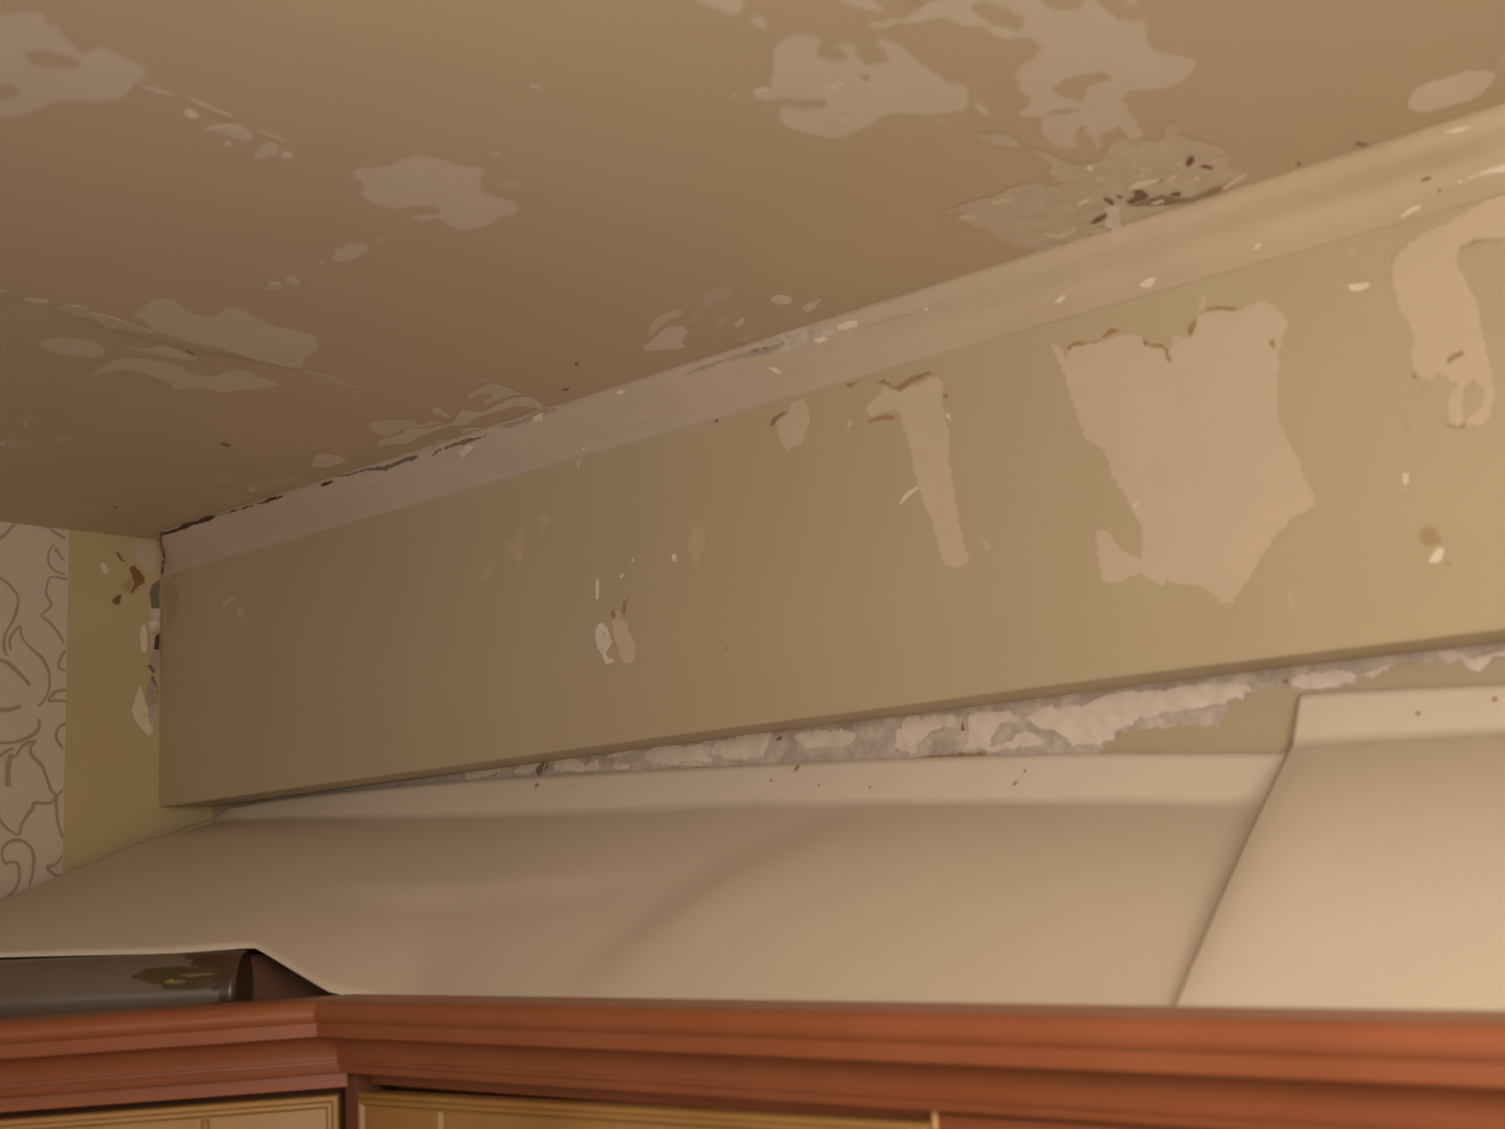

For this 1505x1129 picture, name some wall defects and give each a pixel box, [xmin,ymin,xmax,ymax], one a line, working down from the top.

peeling [0,11,293,160]
peeling [350,152,527,231]
peeling [694,0,1247,255]
peeling [1406,70,1499,113]
peeling [37,297,321,393]
crack [159,406,558,576]
peeling [367,379,552,447]
peeling [845,370,971,568]
peeling [1049,295,1317,605]
peeling [1388,195,1505,430]
flaking render [131,539,163,736]
flaking render [272,642,1505,801]